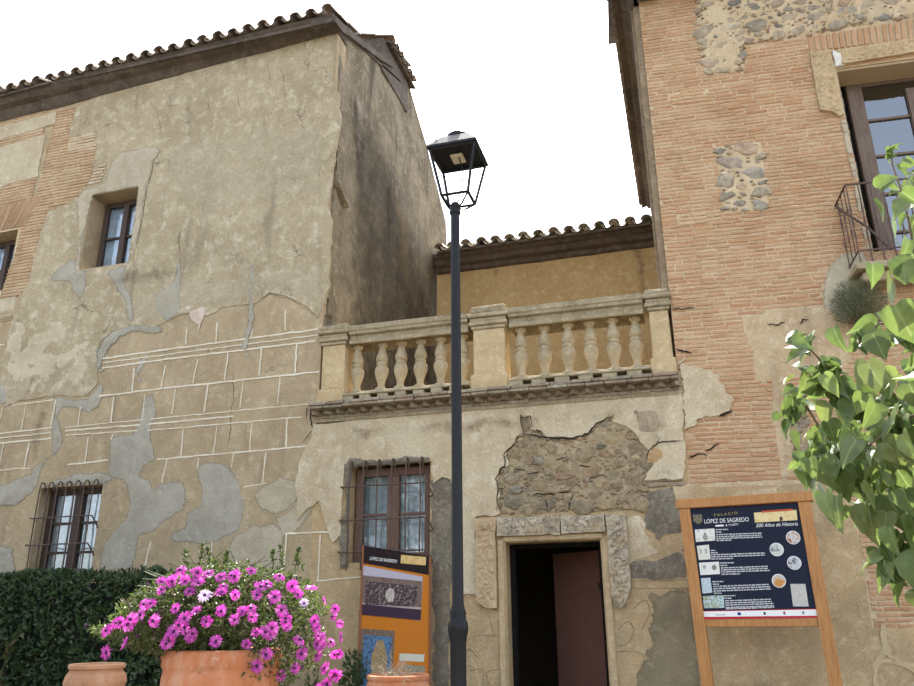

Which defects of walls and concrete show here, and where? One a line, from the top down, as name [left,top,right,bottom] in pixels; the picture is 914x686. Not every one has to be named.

peeling [1,319,90,394]
spalling [630,548,687,580]
spalling [637,589,700,686]